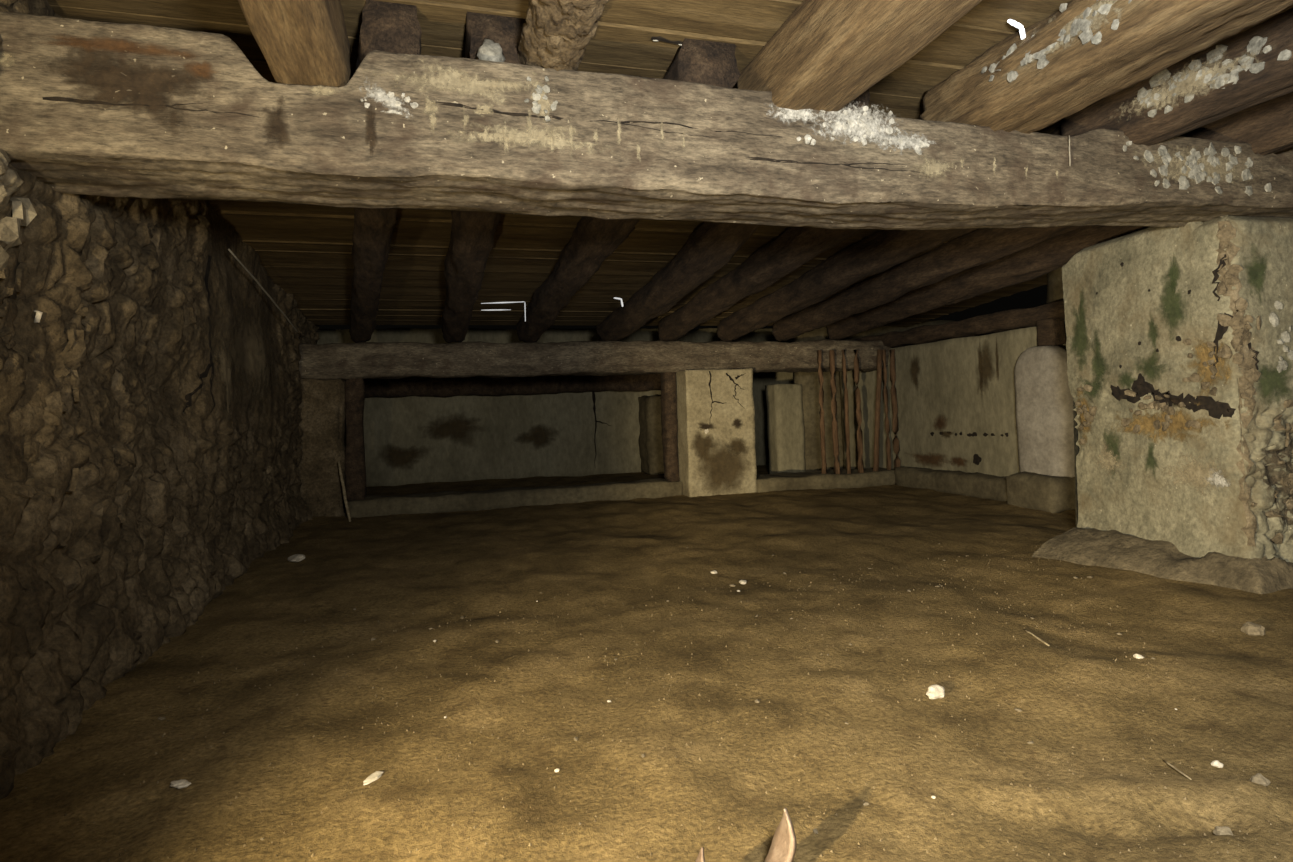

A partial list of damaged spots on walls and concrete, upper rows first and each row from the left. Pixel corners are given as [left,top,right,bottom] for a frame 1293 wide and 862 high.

damp [1168,259,1179,288]
damp [1248,258,1266,292]
damp [1149,321,1158,345]
peeling [1269,301,1293,373]
damp [1085,335,1105,396]
spalling [1110,336,1236,442]
damp [695,435,745,488]
damp [1146,446,1231,495]